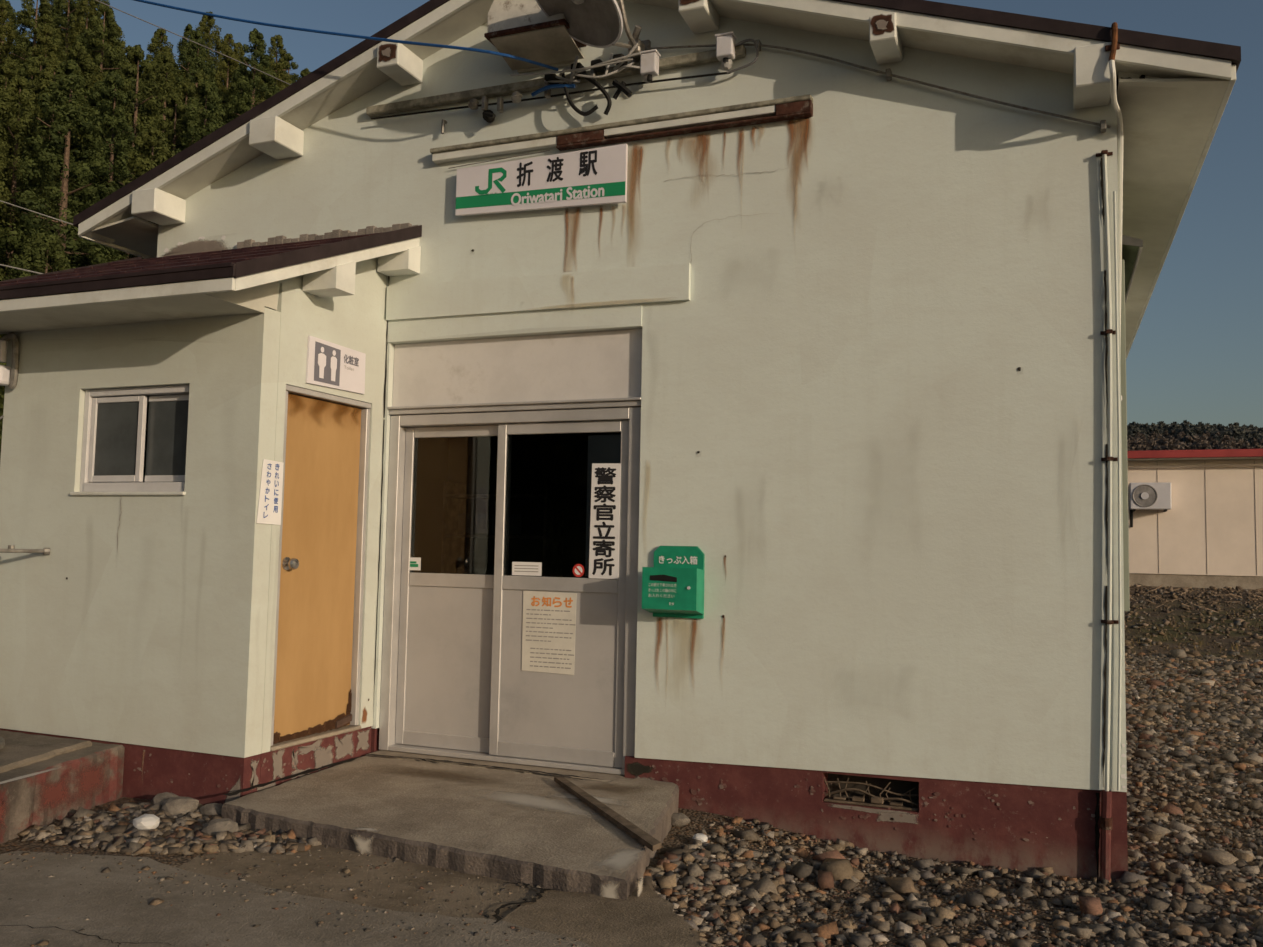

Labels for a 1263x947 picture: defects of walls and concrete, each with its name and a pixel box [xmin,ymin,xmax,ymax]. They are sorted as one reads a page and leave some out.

corrosion [556,100,813,202]
corrosion [565,208,580,255]
corrosion [656,617,667,661]
spalling [0,769,55,784]
peeling [217,714,369,803]
crack [492,882,561,923]